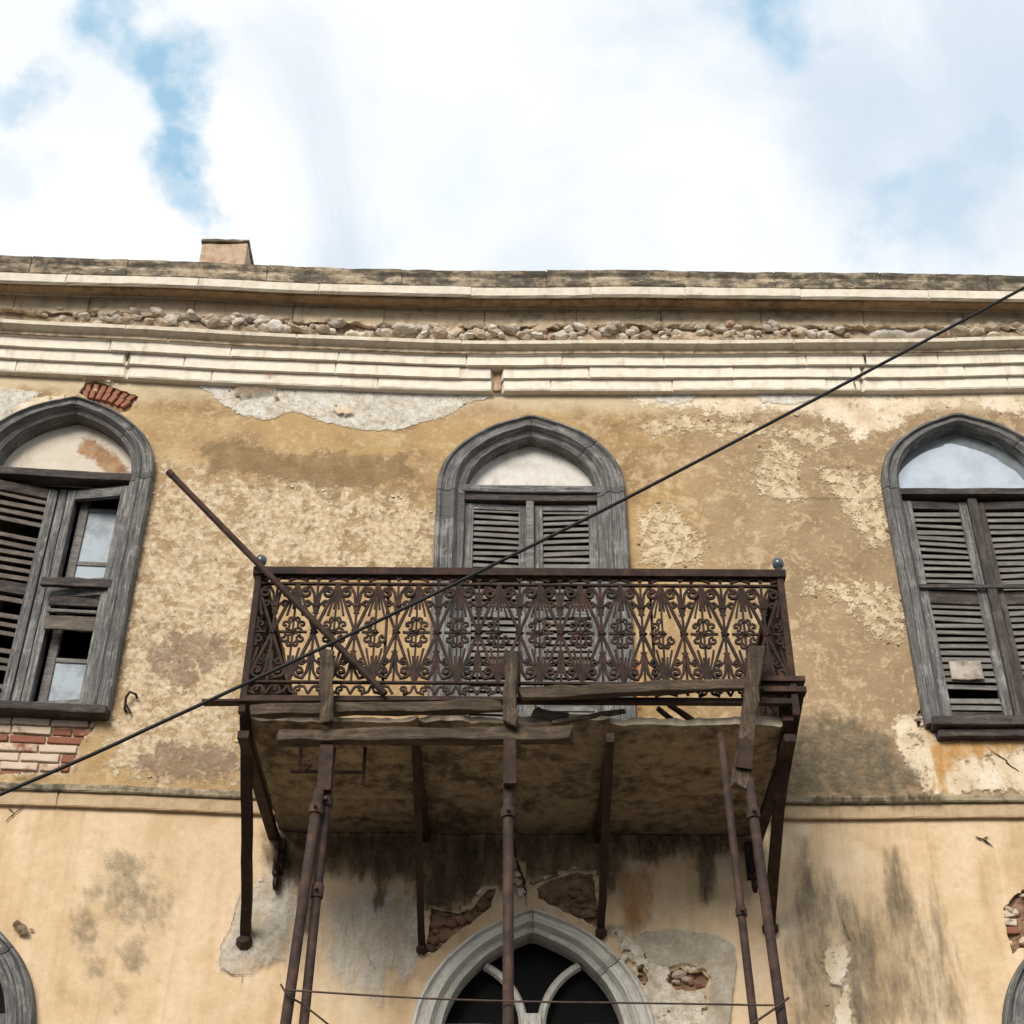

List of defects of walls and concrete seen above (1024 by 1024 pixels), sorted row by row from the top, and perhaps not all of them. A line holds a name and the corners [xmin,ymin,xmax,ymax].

flaking render [75,377,137,413]
peeling [200,386,494,431]
peeling [623,393,1024,548]
peeling [0,456,435,790]
peeling [798,577,905,646]
leakage [787,717,941,804]
peeling [891,712,1024,795]
leakage [697,850,715,903]
flaking render [426,885,499,954]
peeling [514,857,711,1024]
flaking render [1003,891,1024,954]
peeling [820,944,857,1024]